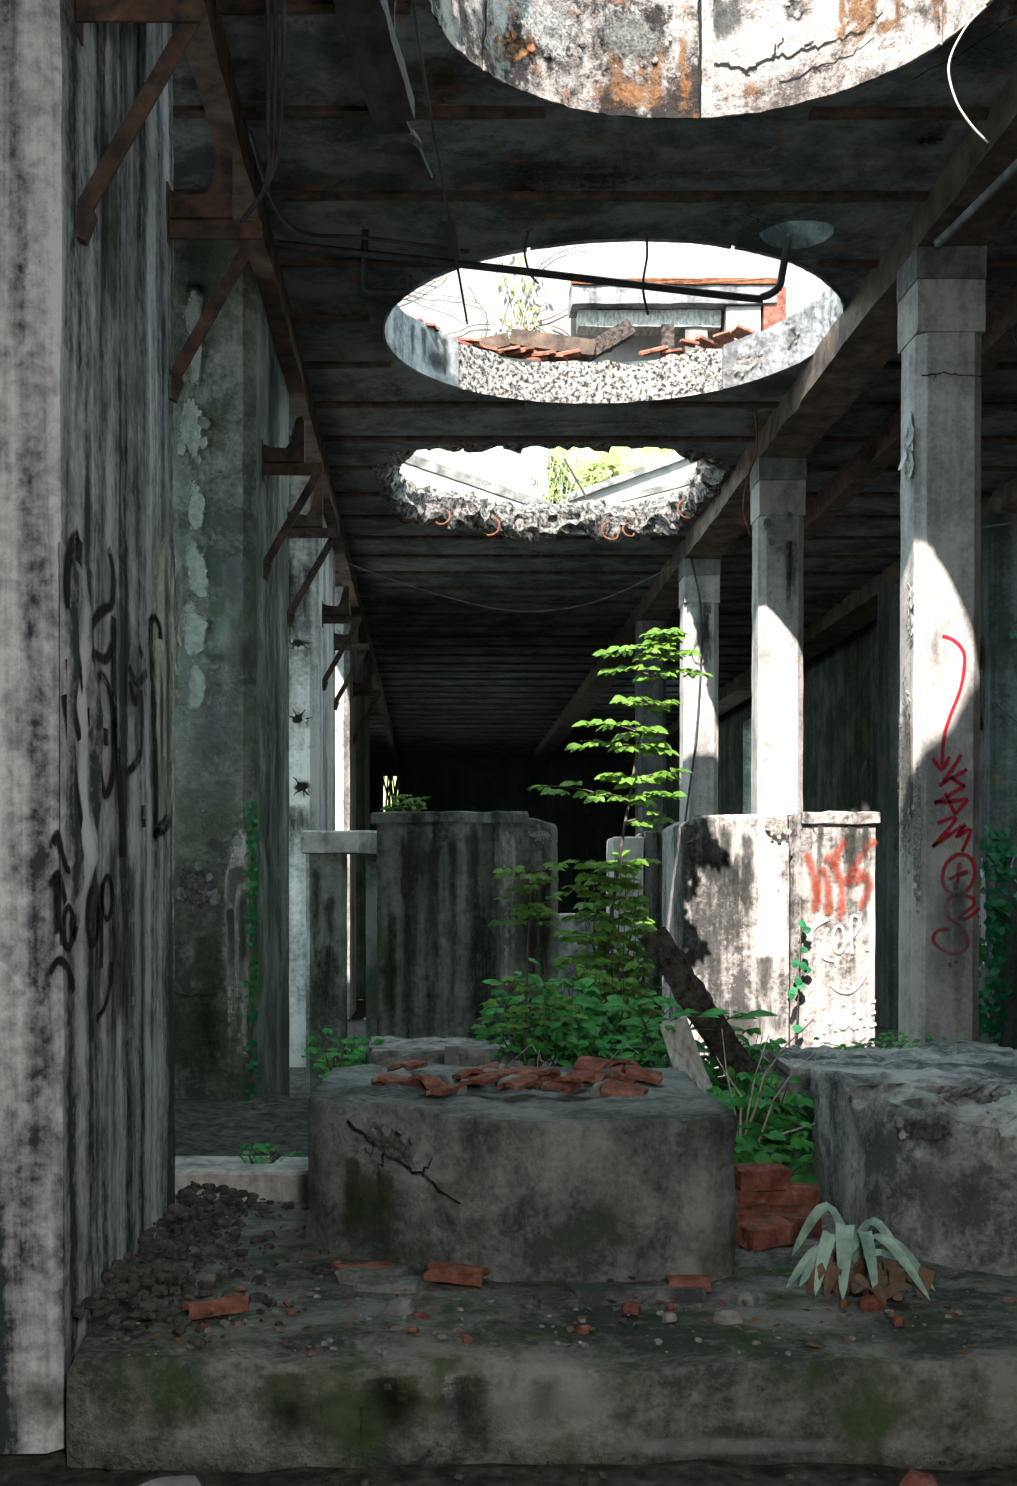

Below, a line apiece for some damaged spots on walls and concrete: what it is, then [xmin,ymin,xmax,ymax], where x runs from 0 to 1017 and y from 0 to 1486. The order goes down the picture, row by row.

rust [596,38,691,108]
crack [697,0,883,112]
rust [838,0,900,46]
rust [931,0,947,27]
spalling [725,349,763,377]
spalling [785,327,800,347]
peeling [175,289,211,711]
spalling [371,442,731,542]
damp [689,814,785,1042]